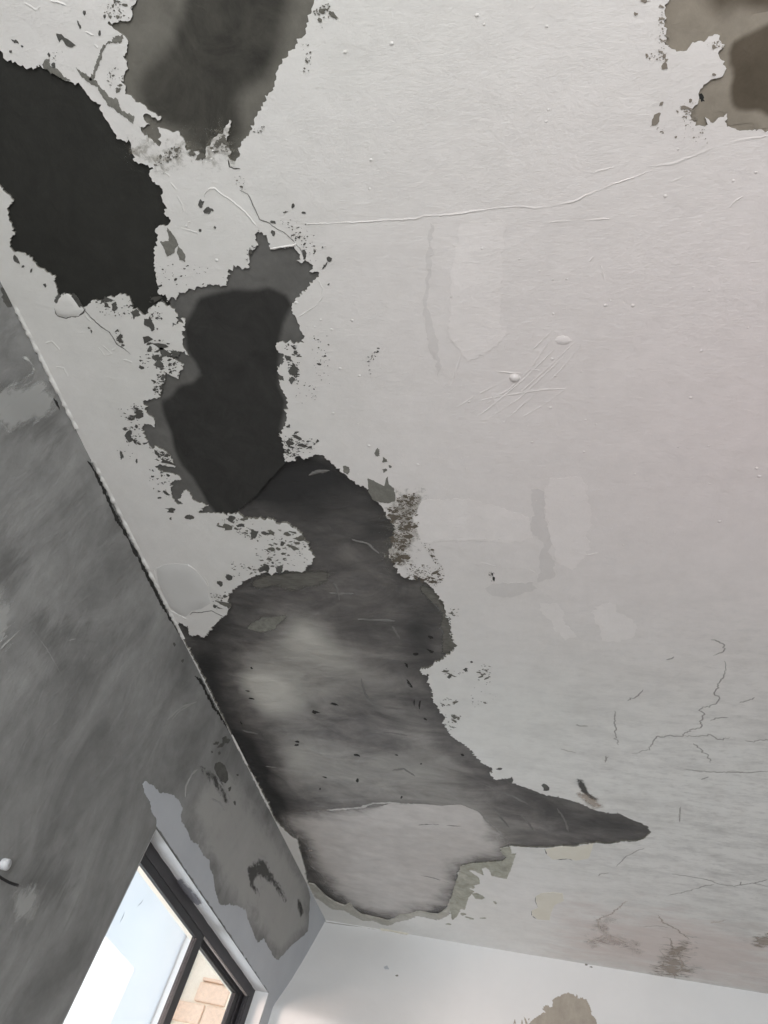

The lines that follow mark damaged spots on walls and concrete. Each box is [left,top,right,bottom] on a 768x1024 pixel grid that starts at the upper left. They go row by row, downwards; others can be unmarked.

peeling [77,0,338,161]
peeling [646,0,768,139]
peeling [0,51,319,514]
leakage [387,493,444,587]
flaking render [91,454,650,1024]
crack [604,639,767,780]
leakage [176,880,201,905]
leakage [248,860,303,916]